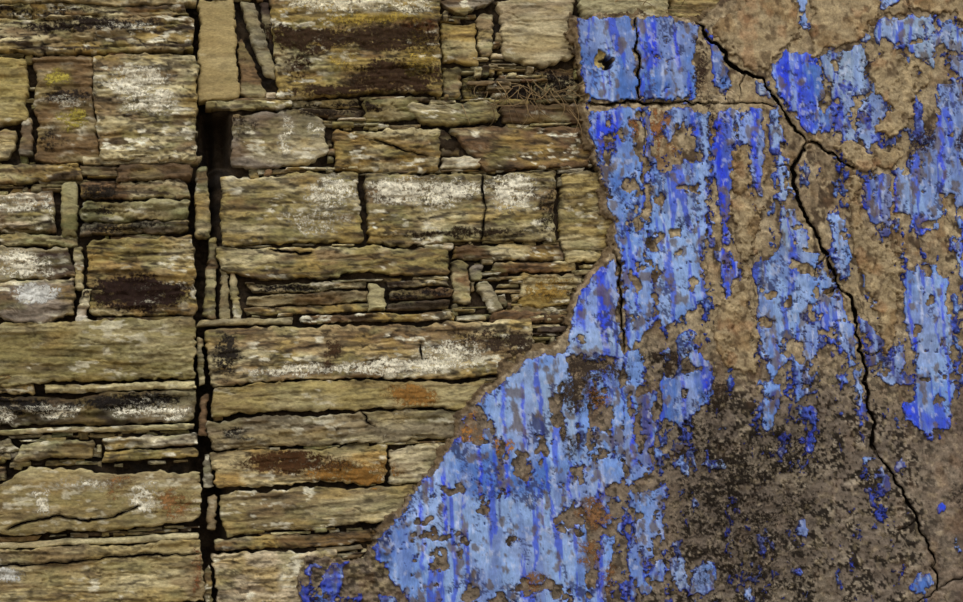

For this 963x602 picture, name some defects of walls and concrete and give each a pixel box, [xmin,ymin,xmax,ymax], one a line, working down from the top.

spalling [234,92,277,101]
peeling [244,0,963,602]
crack [588,18,963,602]